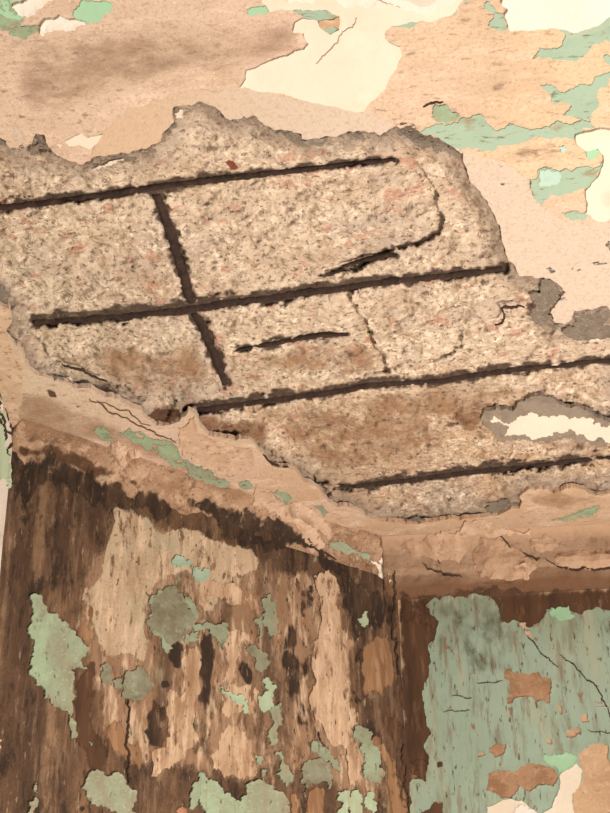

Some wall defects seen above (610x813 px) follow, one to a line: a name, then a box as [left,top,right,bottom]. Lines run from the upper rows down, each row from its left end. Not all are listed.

spalling [0,0,610,540]
corrosion [318,257,390,278]
crack [89,399,177,444]
corrosion [147,409,181,423]
corrosion [201,418,265,442]
water stain [16,445,170,522]
peeling [94,427,392,585]
crack [499,536,610,571]
water stain [74,662,107,770]
water stain [145,701,166,748]
peeling [27,507,610,813]
crack [519,623,610,734]